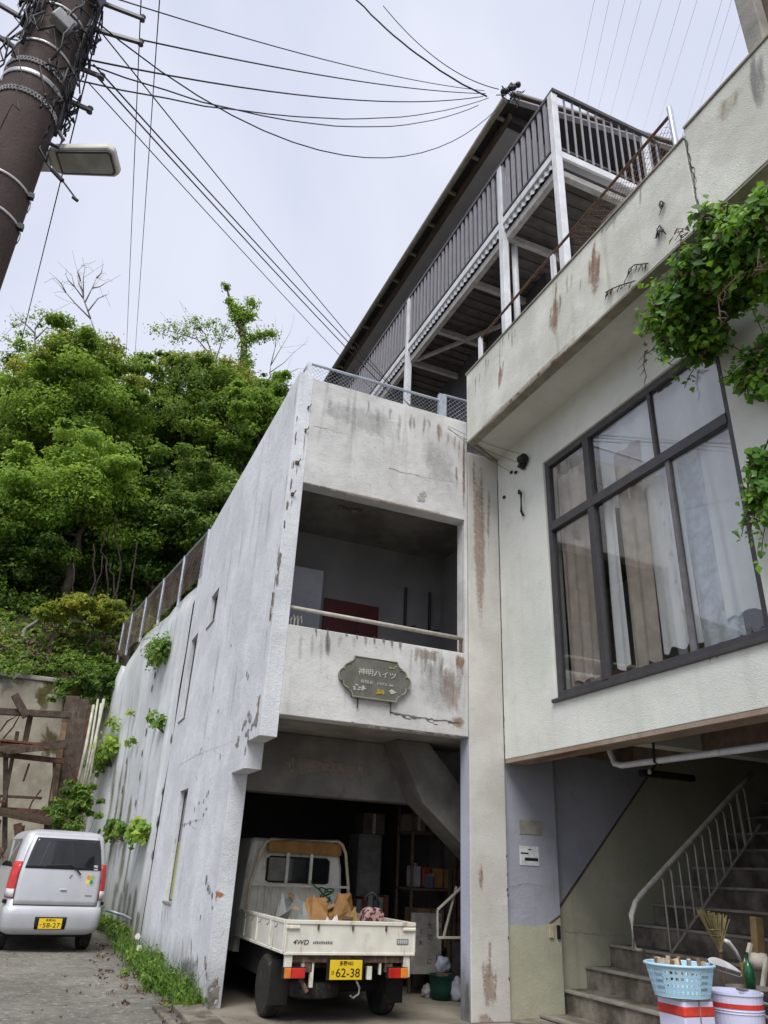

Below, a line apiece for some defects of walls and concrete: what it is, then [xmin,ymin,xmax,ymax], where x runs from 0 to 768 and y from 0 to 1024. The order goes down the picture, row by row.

crack [683,136,699,211]
rust [588,244,600,288]
rust [550,285,561,329]
spalling [269,549,282,621]
peeling [235,695,260,755]
crack [390,712,461,725]